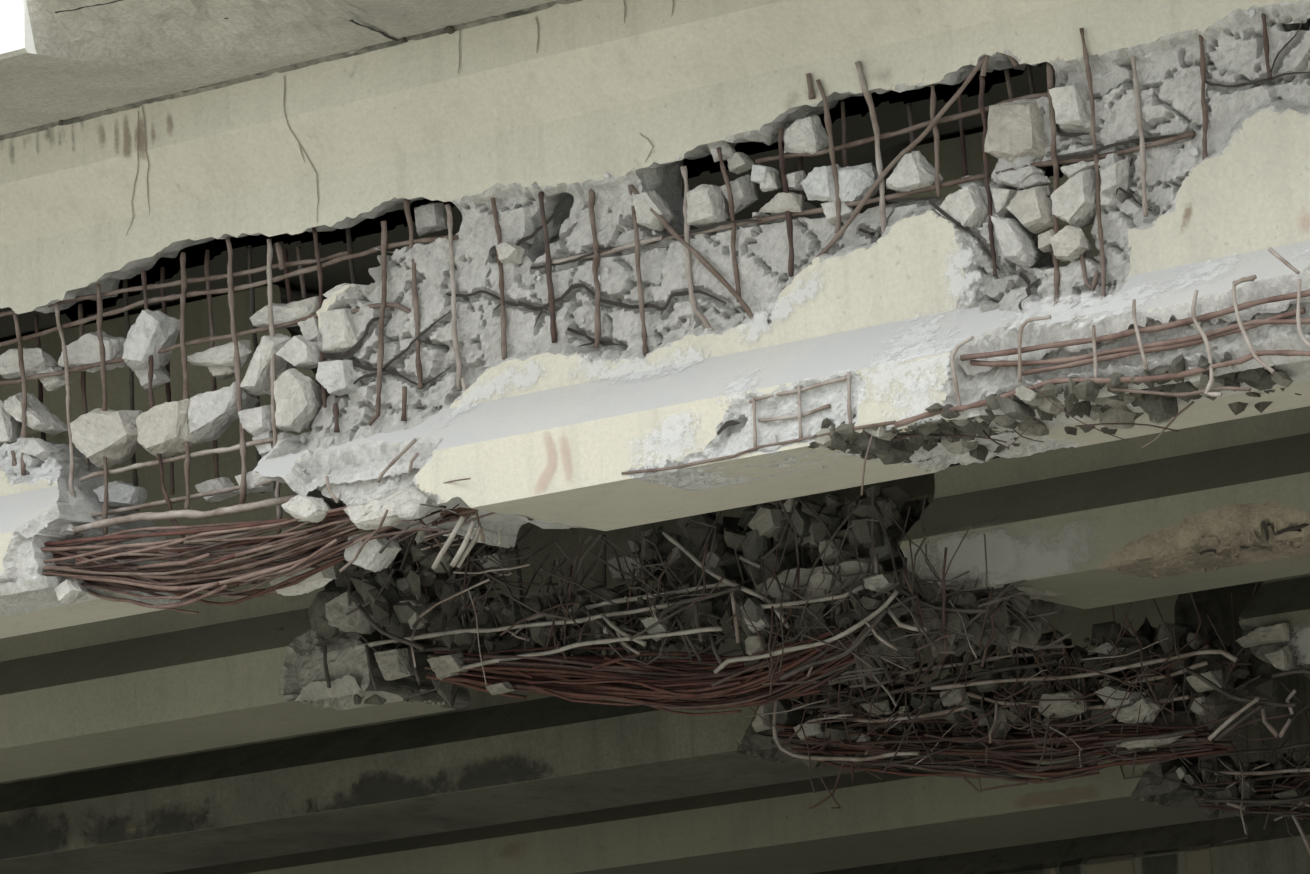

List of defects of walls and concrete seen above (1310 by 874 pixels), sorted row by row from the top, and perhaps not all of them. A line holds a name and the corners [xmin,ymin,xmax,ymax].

crack [126,104,150,235]
crack [283,76,319,208]
spalling [259,0,1310,509]
spalling [0,438,62,485]
spalling [0,504,107,617]
spalling [902,542,1066,599]
spalling [1098,502,1310,579]
spalling [280,630,403,711]
spalling [1241,625,1310,678]
spalling [735,701,801,763]
water stain [0,808,66,860]
water stain [83,799,212,844]